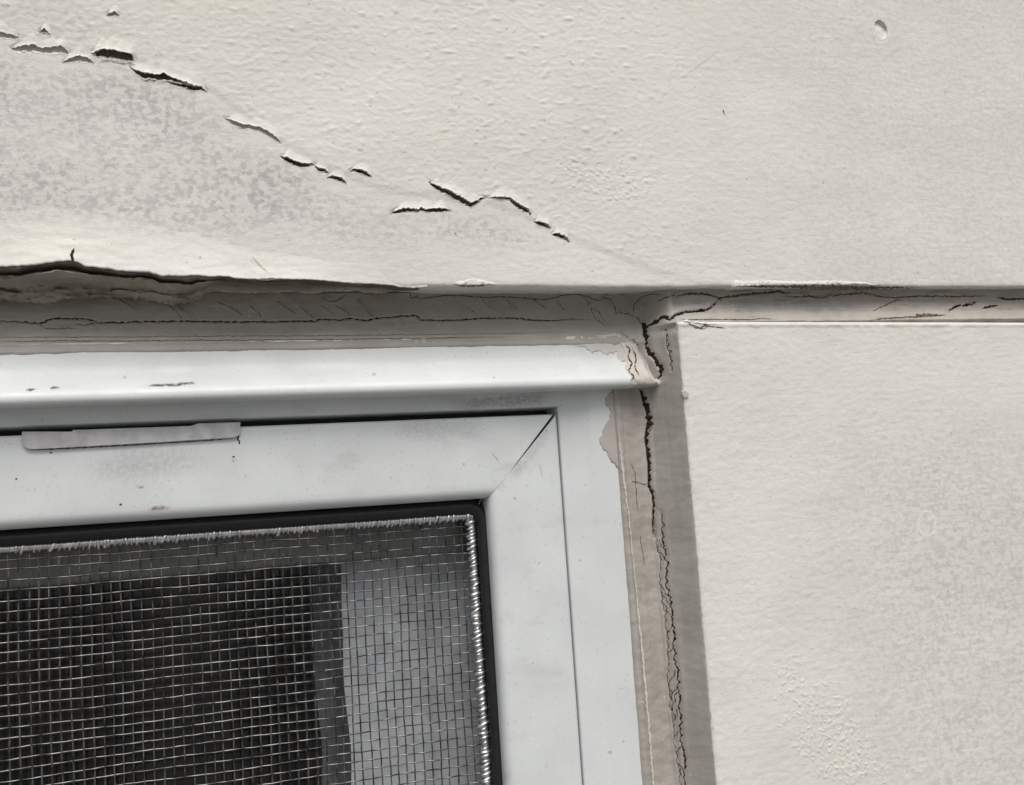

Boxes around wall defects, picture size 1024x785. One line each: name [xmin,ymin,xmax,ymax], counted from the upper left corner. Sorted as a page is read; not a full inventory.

peeling [0,20,208,93]
peeling [224,113,372,183]
peeling [390,179,571,242]
peeling [574,333,625,362]
crack [1,284,1024,785]